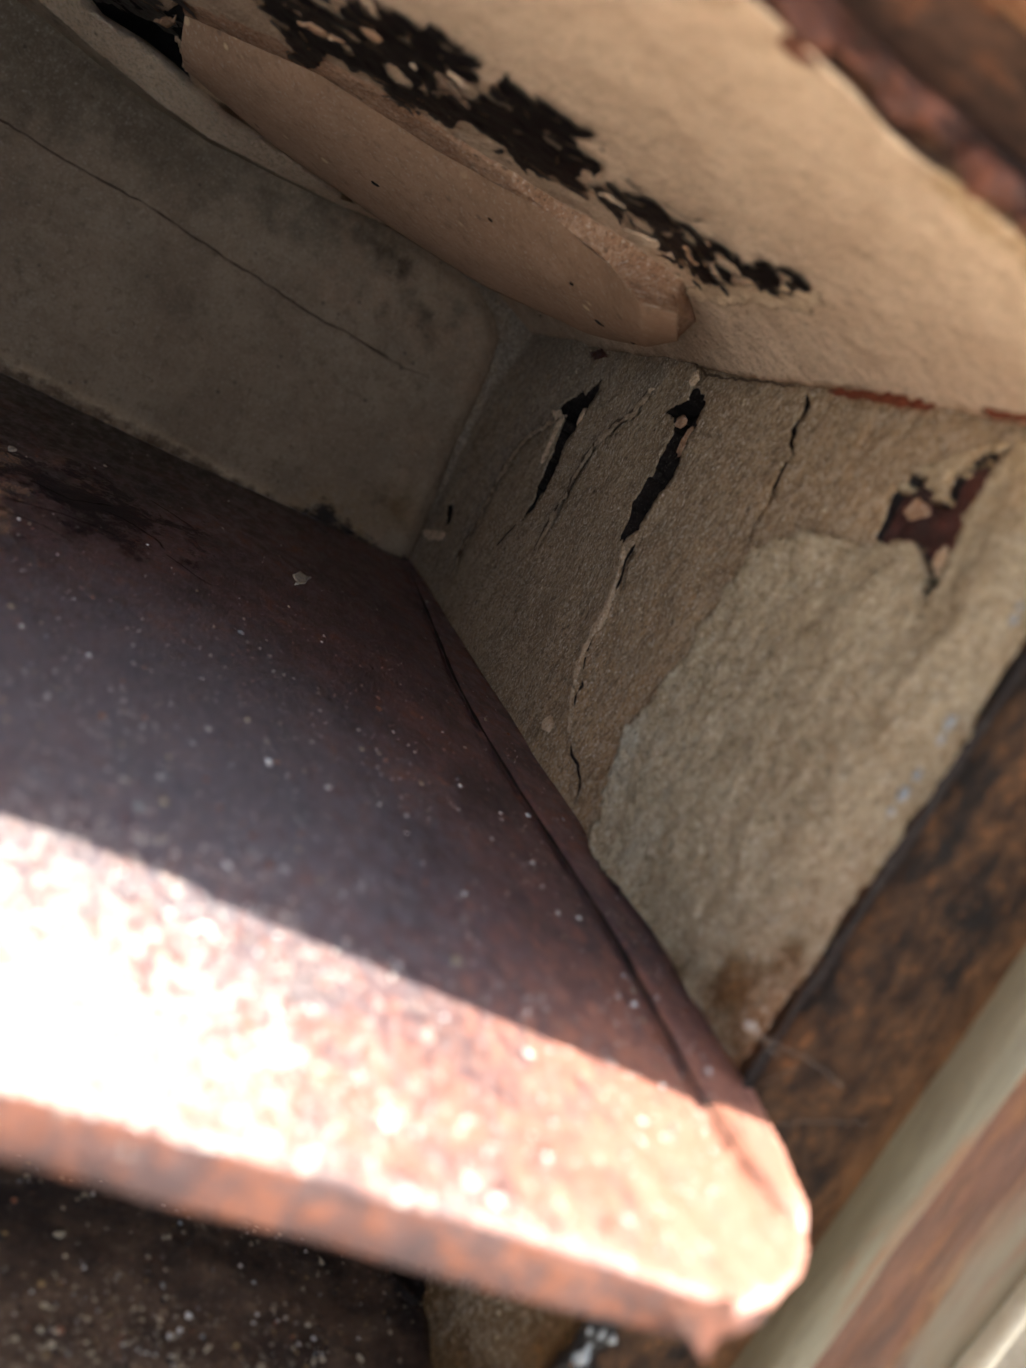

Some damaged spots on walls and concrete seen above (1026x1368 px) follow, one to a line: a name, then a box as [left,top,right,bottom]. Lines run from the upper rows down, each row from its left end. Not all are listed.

spalling [94,0,253,129]
crack [0,119,429,378]
spalling [255,0,824,314]
corrosion [763,0,1026,240]
crack [496,349,608,546]
crack [566,362,812,805]
peeling [587,439,1026,1070]
corrosion [708,940,803,1035]